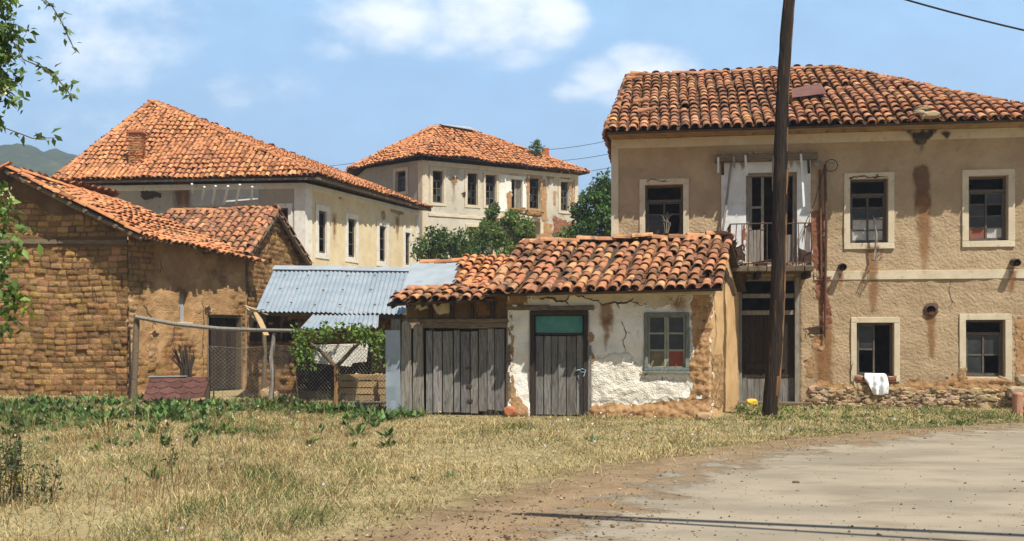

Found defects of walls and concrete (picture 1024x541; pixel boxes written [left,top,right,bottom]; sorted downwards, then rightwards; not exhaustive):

leakage [907,129,950,149]
leakage [913,165,931,261]
flaking render [506,295,570,417]
crack [540,295,656,351]
leakage [601,304,612,342]
flaking render [584,295,725,419]